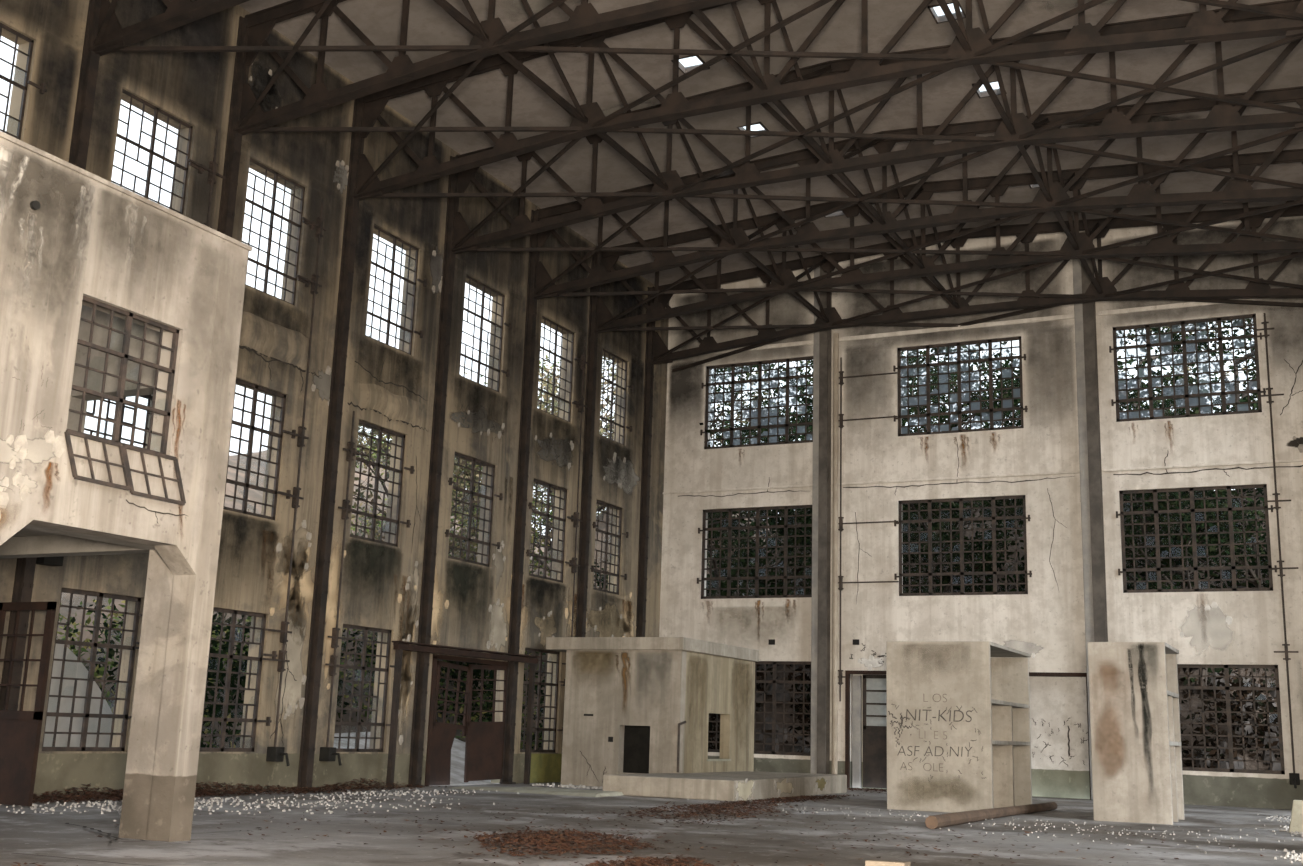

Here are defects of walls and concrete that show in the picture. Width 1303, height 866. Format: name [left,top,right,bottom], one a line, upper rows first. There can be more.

leakage [0,148,94,292]
leakage [106,197,148,264]
peeling [0,430,65,518]
rust [173,402,186,455]
spalling [1287,436,1303,453]